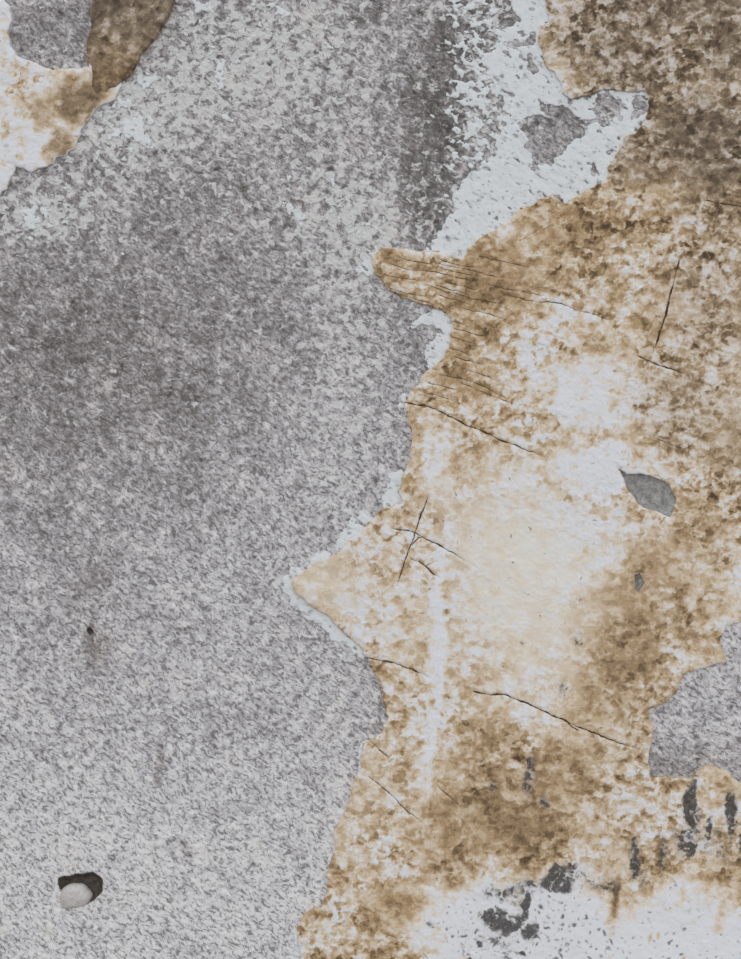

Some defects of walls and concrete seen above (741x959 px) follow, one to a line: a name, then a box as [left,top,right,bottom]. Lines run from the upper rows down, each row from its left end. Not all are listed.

leakage [13,61,117,166]
flaking render [424,0,649,259]
crack [637,260,683,374]
flaking render [0,0,453,959]
crack [393,498,459,585]
crack [405,402,543,457]
leakage [372,0,741,959]
spalling [634,573,644,593]
spalling [619,470,676,517]
crack [366,657,428,677]
crack [473,691,638,749]
spalling [648,622,741,783]